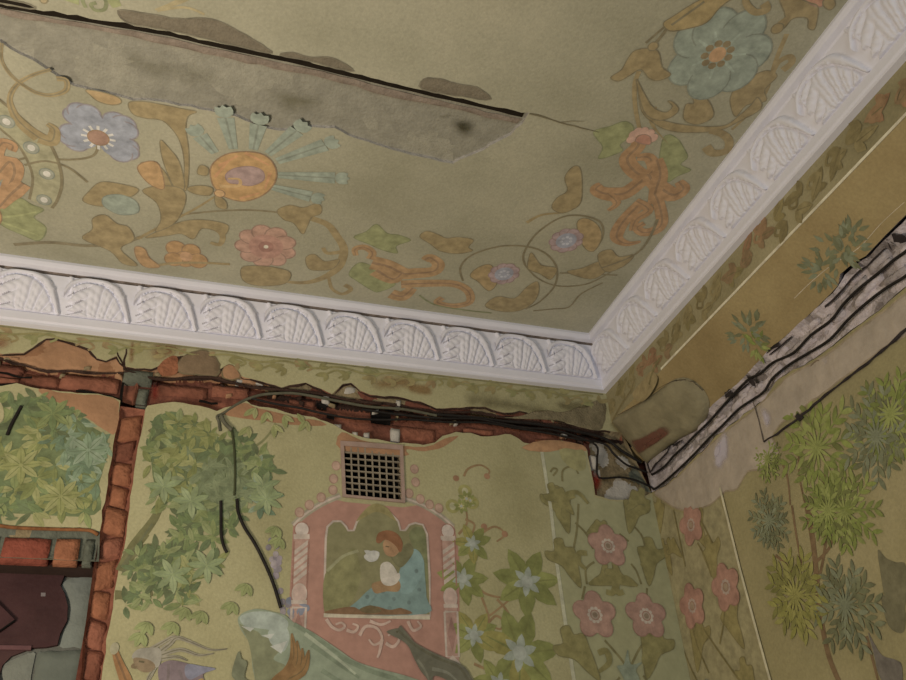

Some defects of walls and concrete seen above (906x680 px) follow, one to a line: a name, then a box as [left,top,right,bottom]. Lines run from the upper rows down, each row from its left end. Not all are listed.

peeling [0,0,527,161]
crack [529,113,598,132]
flaking render [0,220,906,680]